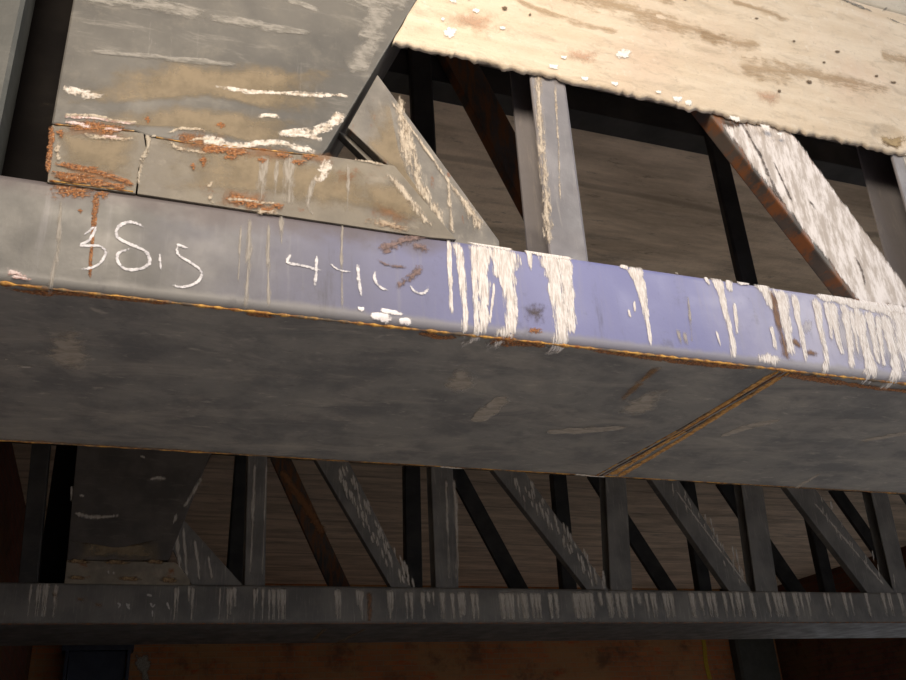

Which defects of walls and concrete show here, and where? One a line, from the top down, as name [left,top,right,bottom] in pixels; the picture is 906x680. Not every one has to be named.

rust [45,120,133,277]
leakage [63,65,374,305]
rust [179,134,328,169]
rust [366,187,426,287]
leakage [355,75,576,354]
leakage [620,264,652,345]
rust [596,350,750,397]
rust [609,369,906,479]
rust [771,293,817,358]
leakage [704,123,906,388]
leakage [514,478,675,618]
leakage [499,593,559,619]